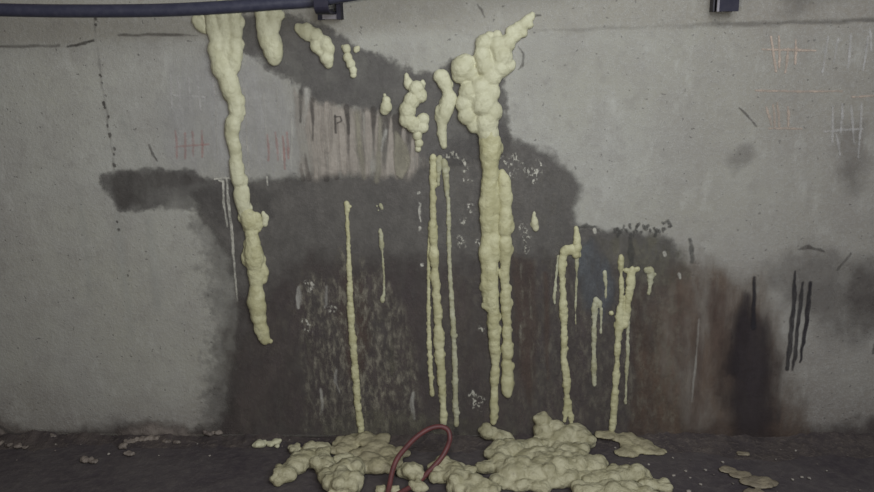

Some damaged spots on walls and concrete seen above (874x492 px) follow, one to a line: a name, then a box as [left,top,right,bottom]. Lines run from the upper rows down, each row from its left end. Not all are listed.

leakage [100,14,772,437]
leakage [785,271,812,370]